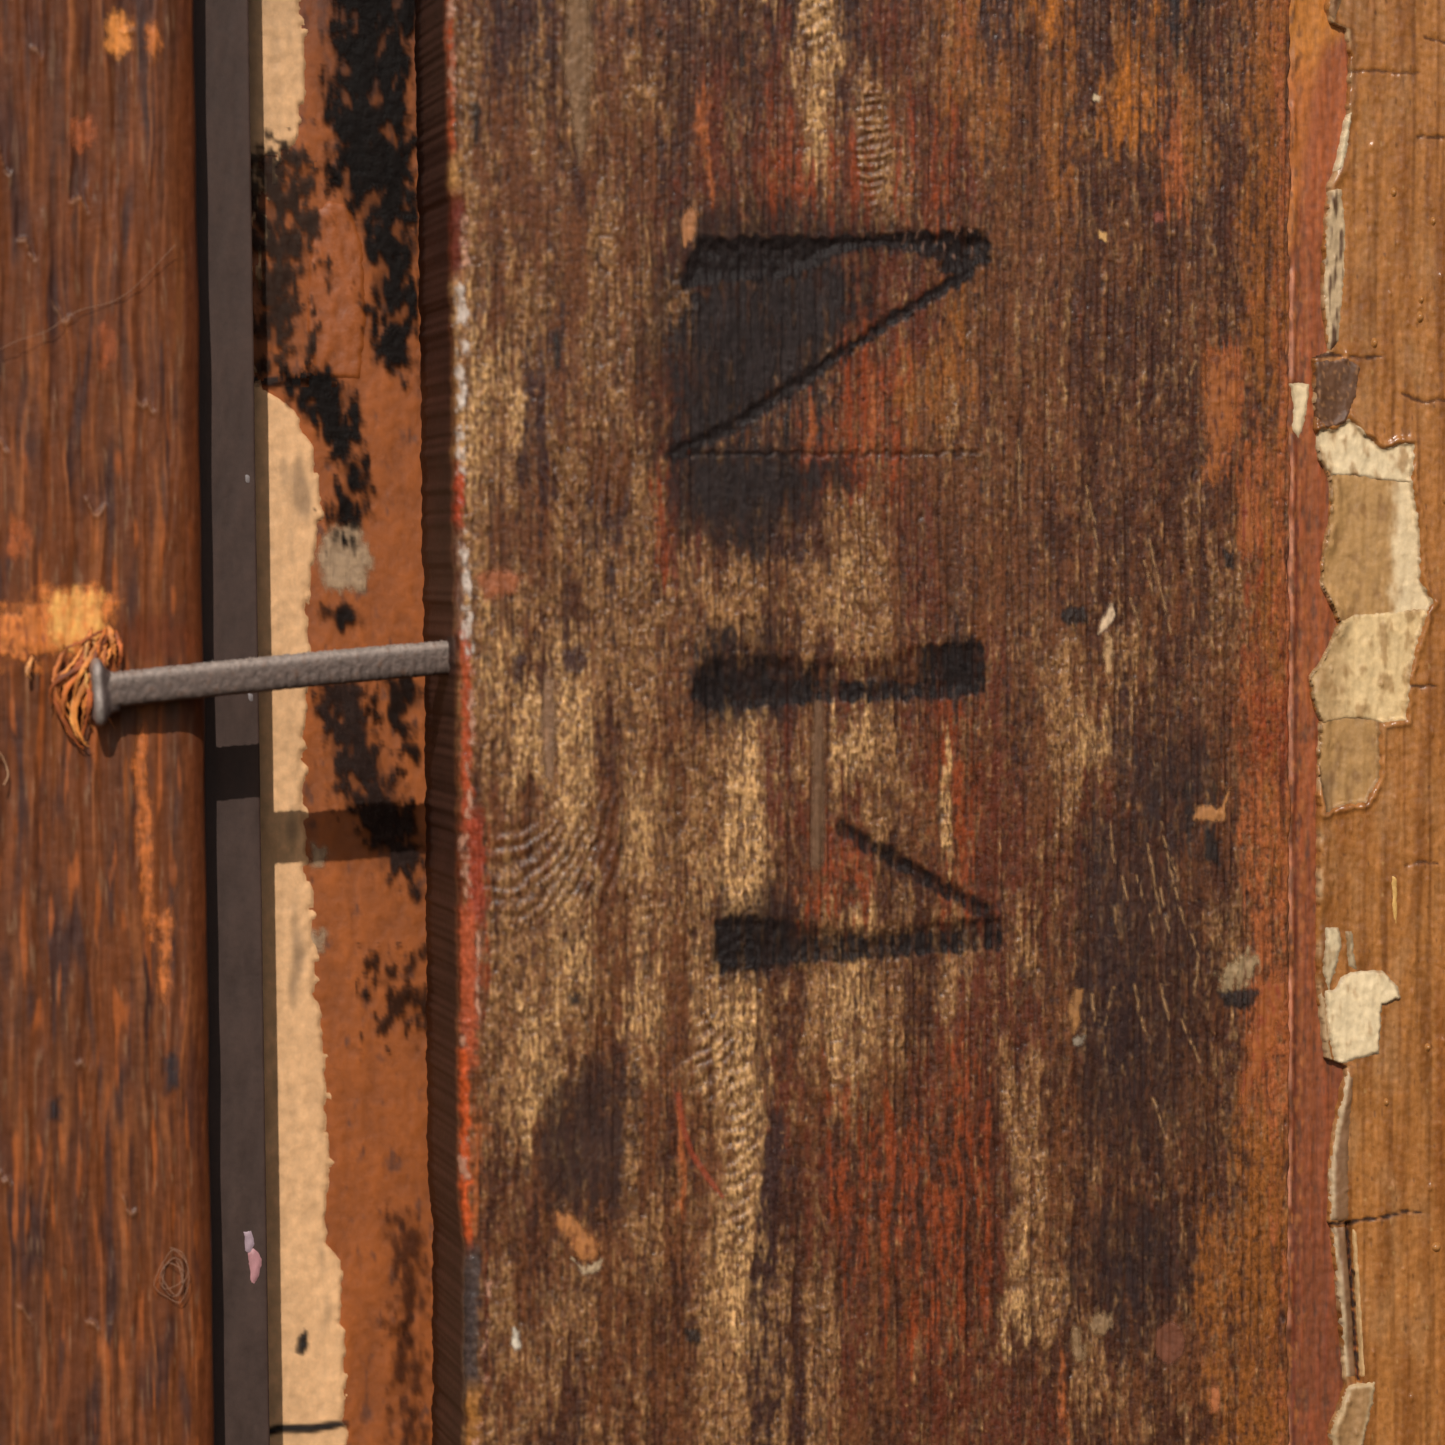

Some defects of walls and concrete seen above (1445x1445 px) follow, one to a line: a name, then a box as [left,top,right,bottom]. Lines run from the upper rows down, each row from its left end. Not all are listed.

leakage [251,0,421,546]
peeling [1332,113,1352,171]
peeling [1289,189,1433,812]
peeling [1318,927,1401,1445]